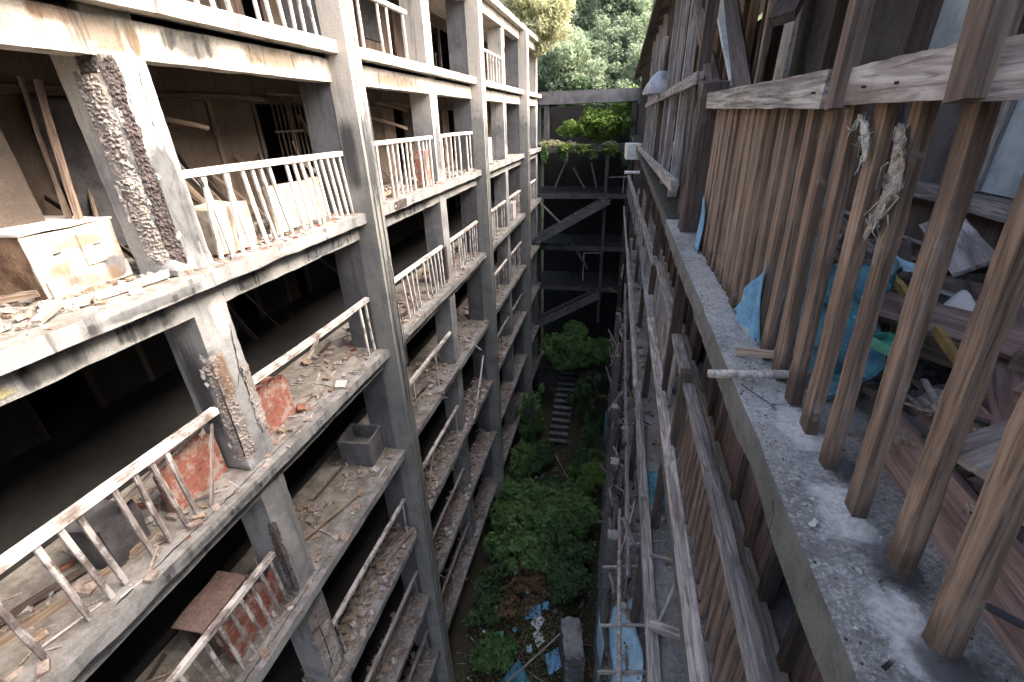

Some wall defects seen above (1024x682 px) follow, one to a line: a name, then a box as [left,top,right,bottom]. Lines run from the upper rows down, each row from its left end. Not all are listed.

spalling [73,55,188,266]
spalling [199,351,268,463]
spalling [268,521,299,592]
leakage [866,544,922,588]
leakage [913,640,985,682]